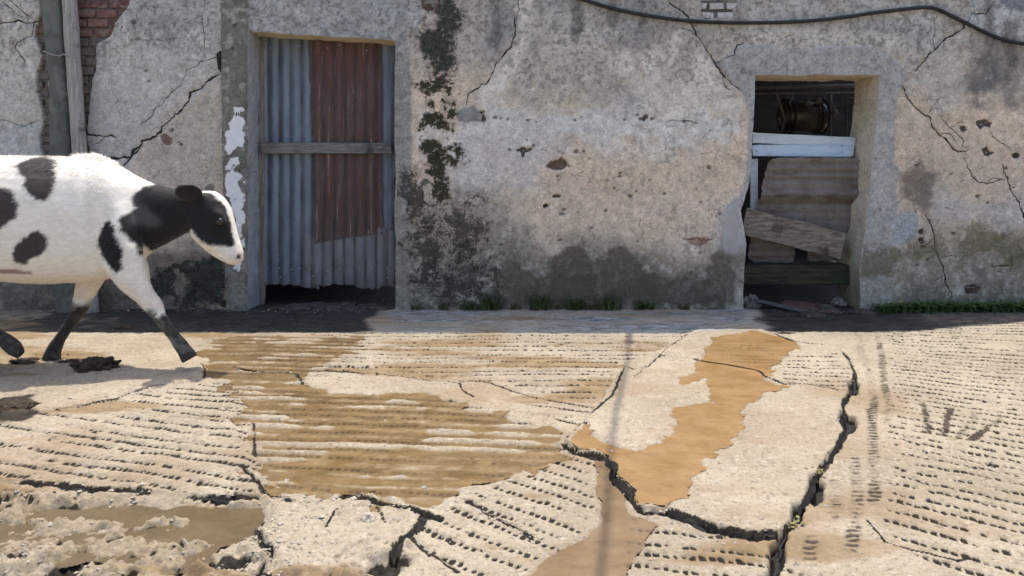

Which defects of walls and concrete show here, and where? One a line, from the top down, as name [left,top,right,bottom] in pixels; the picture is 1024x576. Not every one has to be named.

spalling [36,18,49,157]
spalling [77,0,129,154]
crack [88,13,220,166]
peeling [224,107,245,248]
damp [419,0,467,84]
damp [397,161,508,309]
crack [466,1,520,103]
crack [668,0,743,92]
crack [924,214,956,297]
crack [902,4,1024,218]